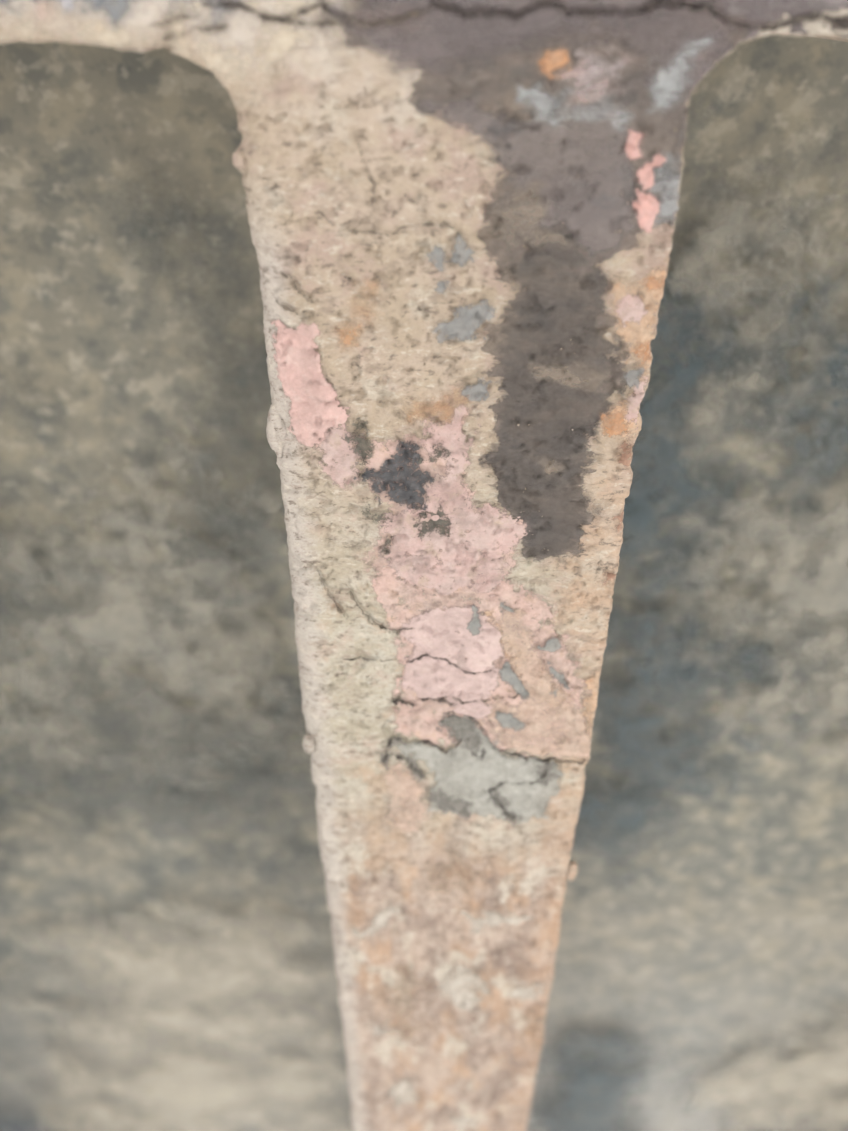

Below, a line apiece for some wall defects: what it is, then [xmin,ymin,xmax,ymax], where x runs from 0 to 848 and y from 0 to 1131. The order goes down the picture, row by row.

damp [0,0,148,48]
damp [0,467,307,791]
peeling [271,320,592,835]
crack [152,0,848,42]
damp [169,0,848,561]
damp [573,196,848,860]